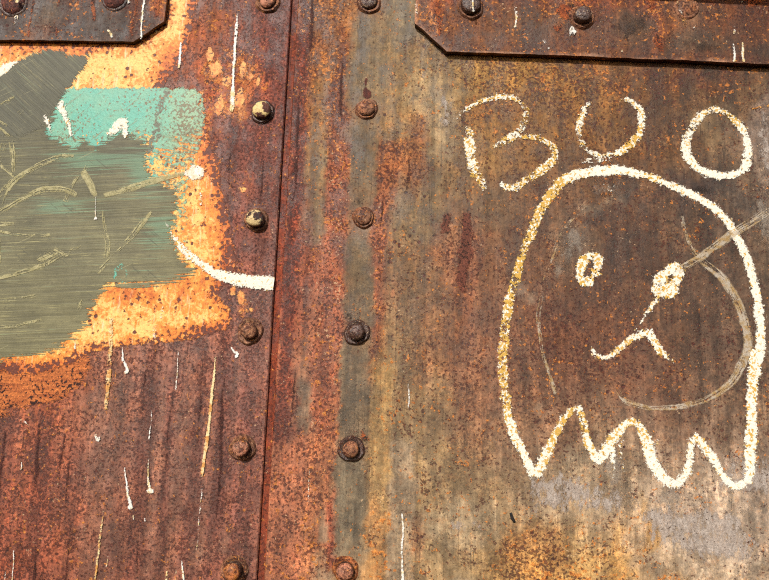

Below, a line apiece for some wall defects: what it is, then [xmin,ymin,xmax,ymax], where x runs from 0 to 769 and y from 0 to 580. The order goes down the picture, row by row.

peeling [0,0,197,98]
peeling [206,47,261,115]
peeling [0,91,253,376]
corrosion [0,355,91,418]
corrosion [216,379,225,514]